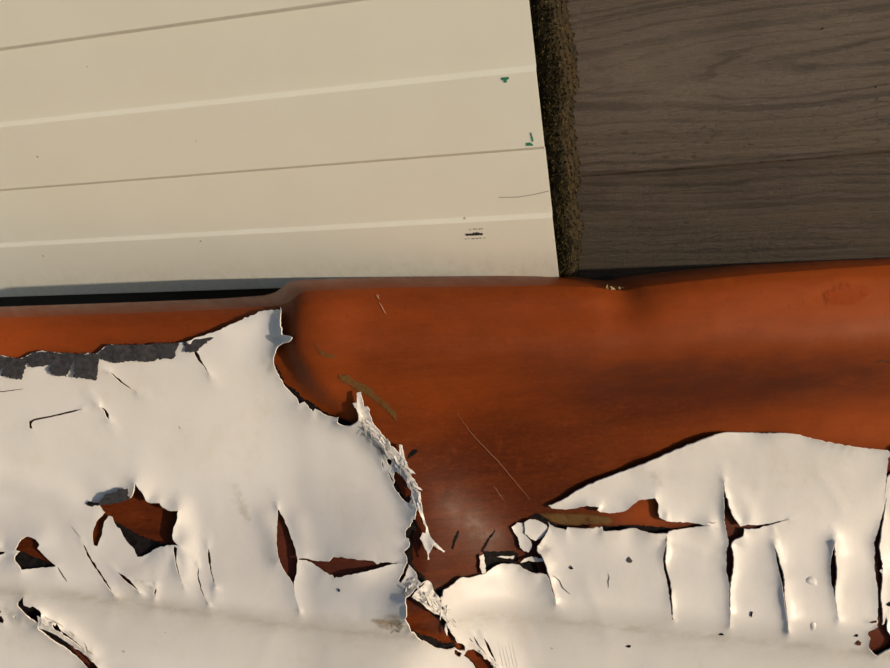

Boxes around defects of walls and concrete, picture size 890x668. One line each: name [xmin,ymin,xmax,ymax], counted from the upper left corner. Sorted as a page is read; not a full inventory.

peeling [0,265,890,635]
crack [663,539,673,619]
crack [710,492,784,606]
crack [829,549,837,597]
crack [868,506,890,655]